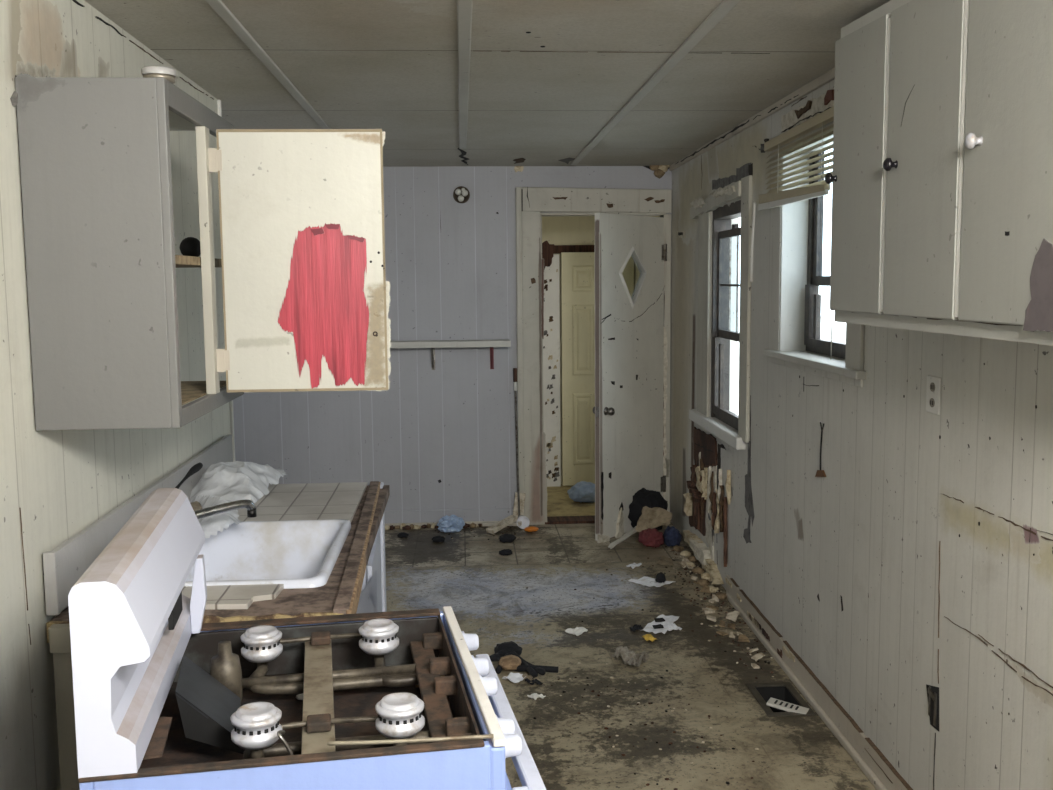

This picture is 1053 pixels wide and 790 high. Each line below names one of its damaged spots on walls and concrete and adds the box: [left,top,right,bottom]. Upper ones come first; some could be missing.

peeling [683,465,705,516]
water stain [930,483,1053,591]
crack [943,494,1053,541]
spalling [673,530,795,669]
crack [937,541,1053,708]